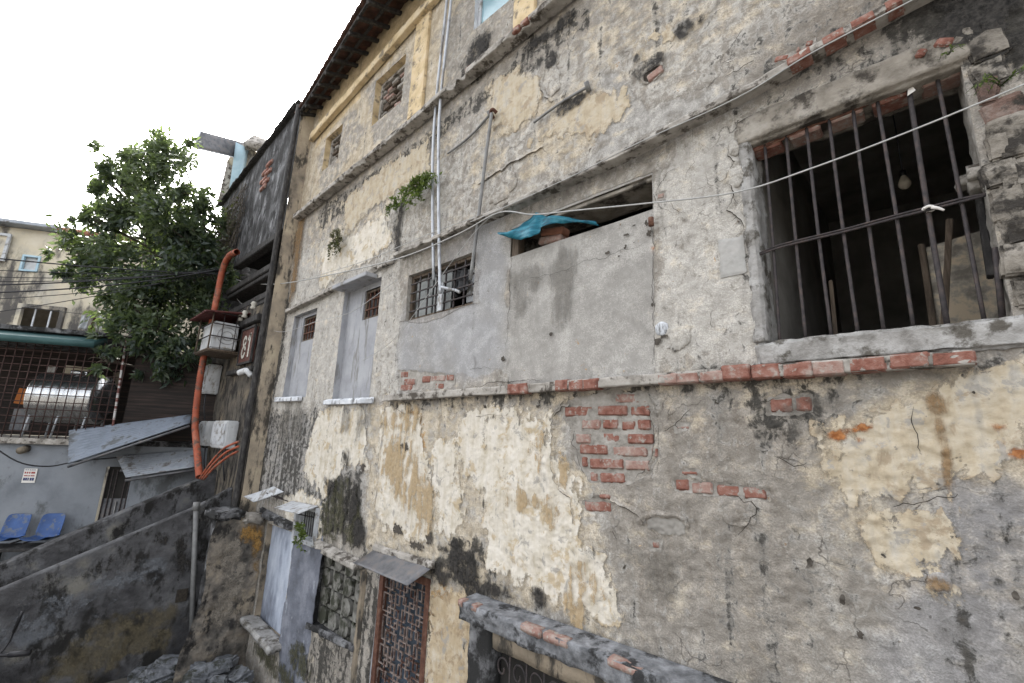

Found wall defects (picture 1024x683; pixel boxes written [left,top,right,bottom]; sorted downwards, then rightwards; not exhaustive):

damp [458,25,491,85]
peeling [484,62,631,149]
crack [505,138,746,355]
corrosion [828,423,872,442]
damp [926,393,952,487]
damp [323,477,365,546]
peeling [283,369,663,628]
crack [728,494,762,535]
peeling [765,359,1024,606]
crack [894,494,958,507]
damp [429,539,511,598]
damp [530,587,547,611]